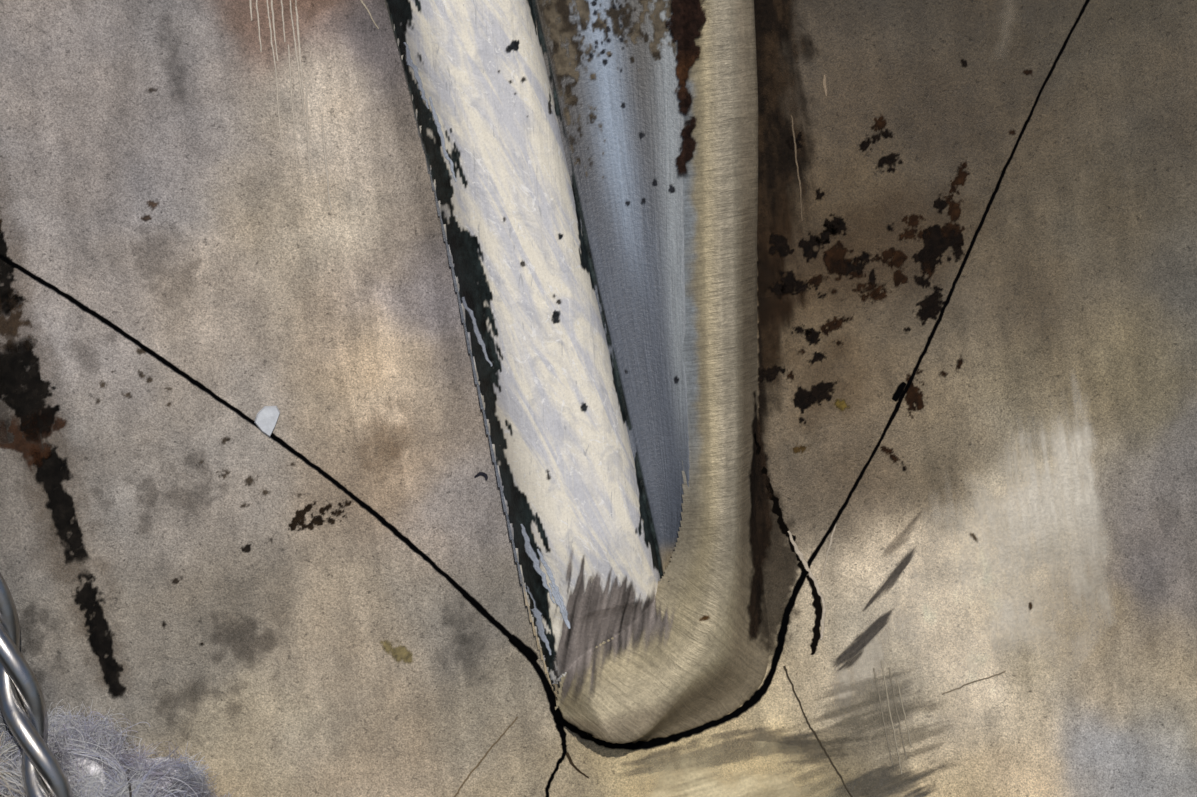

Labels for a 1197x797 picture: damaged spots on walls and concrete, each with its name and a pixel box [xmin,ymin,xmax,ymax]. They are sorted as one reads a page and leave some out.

corrosion [0,219,126,698]
crack [0,254,258,427]
peeling [386,0,669,697]
crack [270,0,1090,797]
corrosion [665,0,707,175]
corrosion [748,0,970,652]